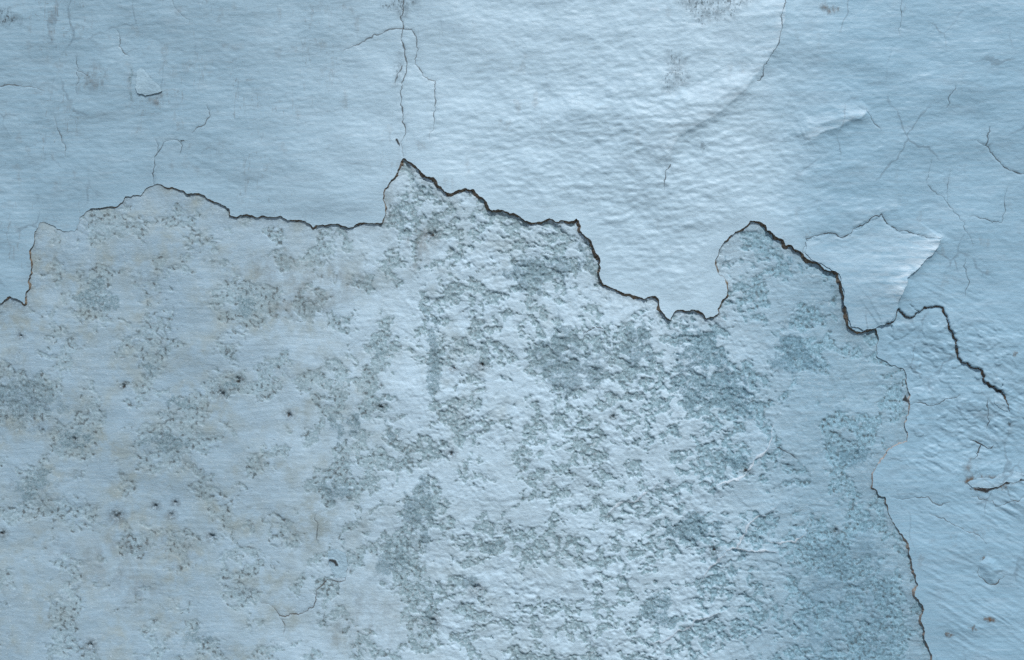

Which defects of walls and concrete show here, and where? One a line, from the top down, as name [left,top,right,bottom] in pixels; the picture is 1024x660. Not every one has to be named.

crack [399,0,407,157]
crack [978,127,1022,174]
crack [805,213,940,246]
peeling [0,158,941,660]